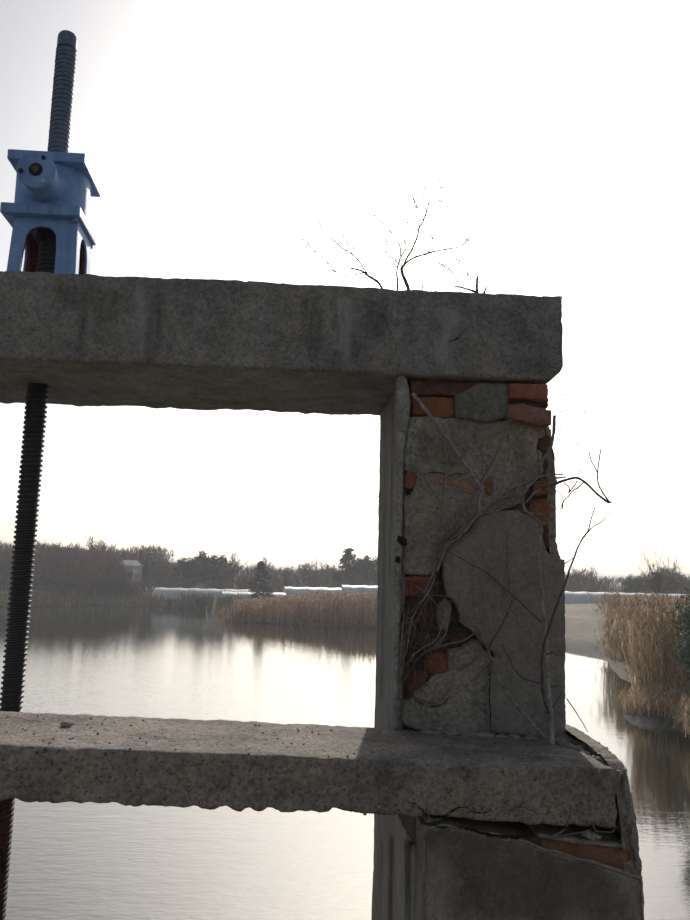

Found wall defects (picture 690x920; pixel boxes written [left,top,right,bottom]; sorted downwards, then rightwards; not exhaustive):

flaking render [409,379,476,419]
flaking render [504,383,552,453]
flaking render [404,471,416,496]
flaking render [501,481,565,561]
crack [414,665,491,731]
flaking render [0,714,643,880]